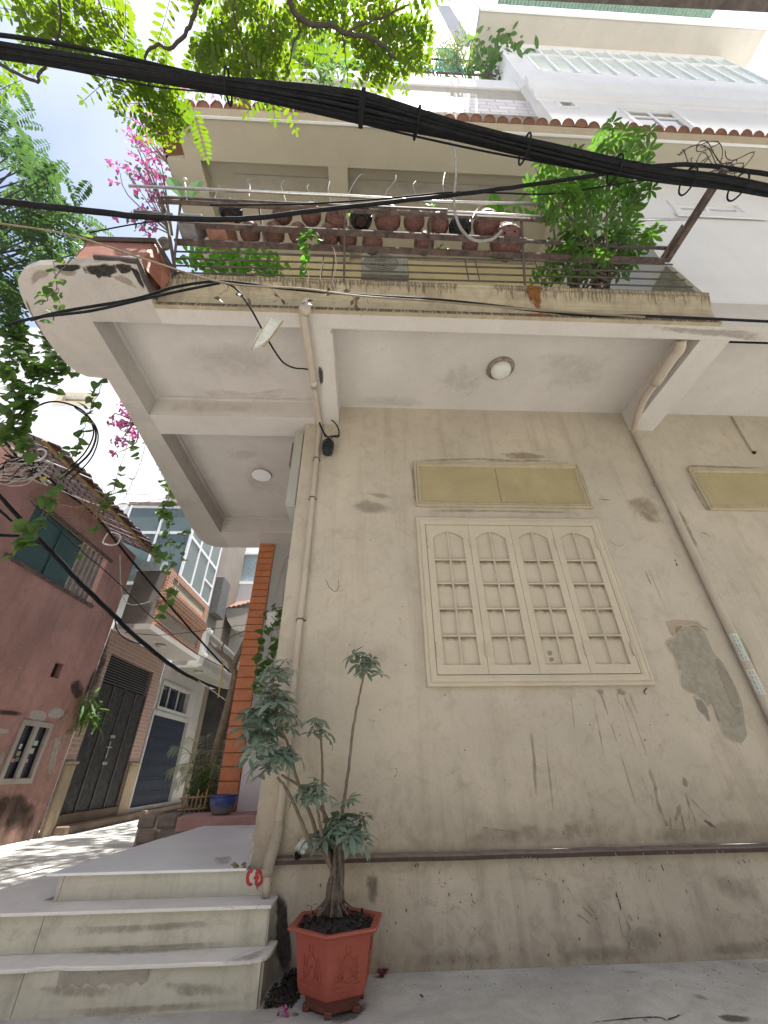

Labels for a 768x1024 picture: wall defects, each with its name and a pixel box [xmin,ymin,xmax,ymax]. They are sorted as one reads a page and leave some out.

damp [157,302,718,322]
corrosion [527,285,551,316]
peeling [665,624,747,743]